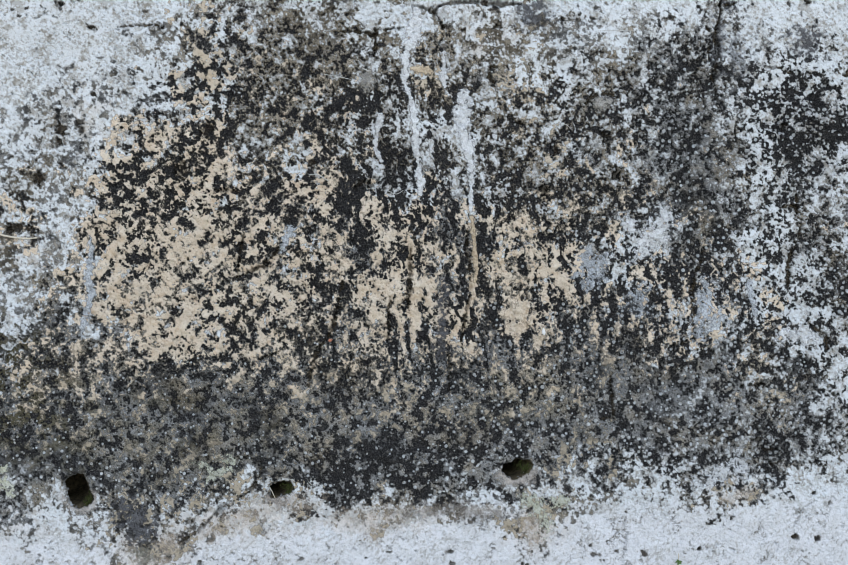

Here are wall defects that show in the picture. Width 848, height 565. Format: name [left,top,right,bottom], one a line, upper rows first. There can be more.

crack [413,0,520,30]
crack [705,2,735,92]
water stain [16,80,99,137]
water stain [91,86,128,131]
water stain [198,227,215,248]
water stain [91,258,115,308]
water stain [0,291,12,328]
water stain [289,491,319,522]
water stain [526,505,549,557]